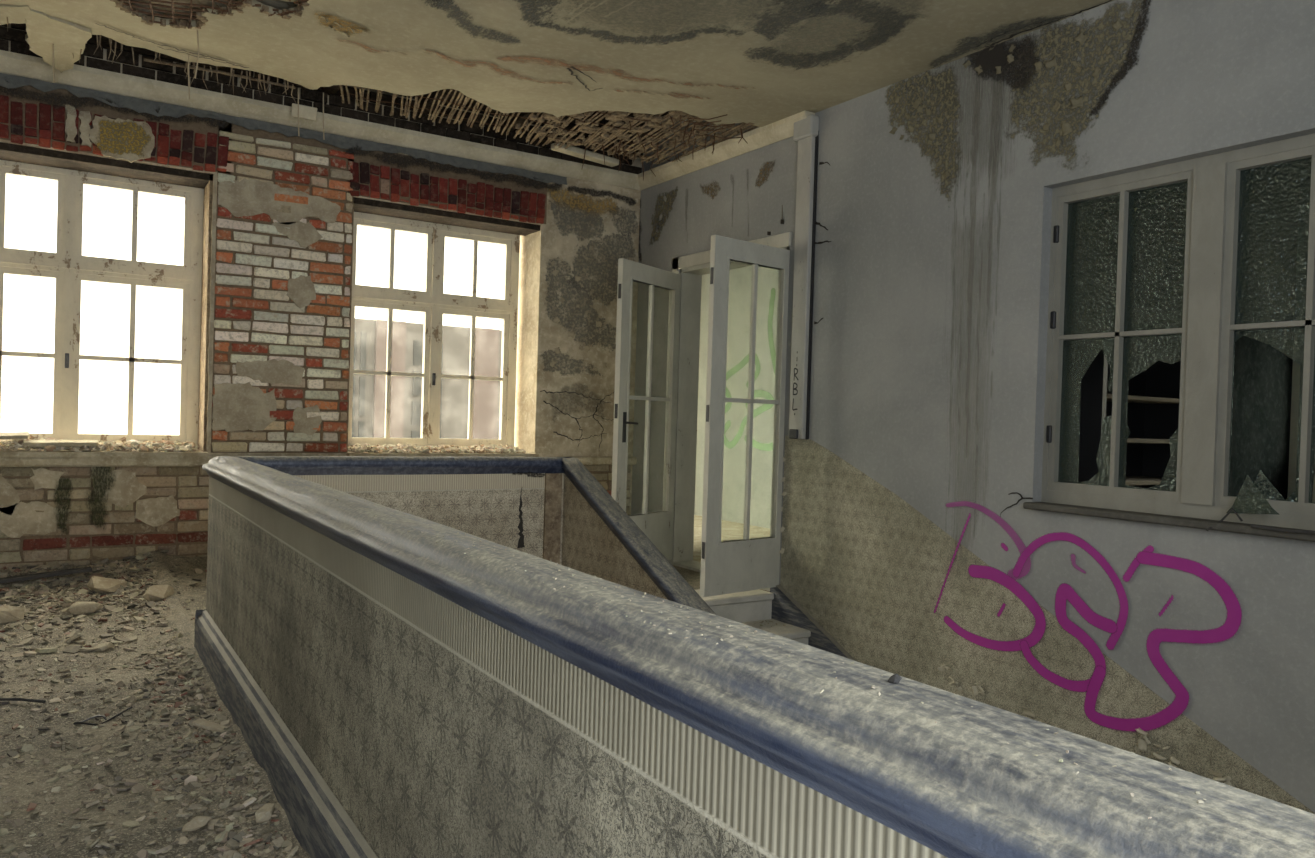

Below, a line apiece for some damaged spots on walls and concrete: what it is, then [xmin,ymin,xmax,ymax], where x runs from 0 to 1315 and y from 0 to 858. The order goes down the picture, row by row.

spalling [110,0,310,79]
damp [425,0,520,43]
damp [517,0,916,70]
spalling [885,0,1151,199]
flaking render [211,115,354,453]
peeling [542,189,678,378]
flaking render [0,466,209,570]
flaking render [584,465,631,515]